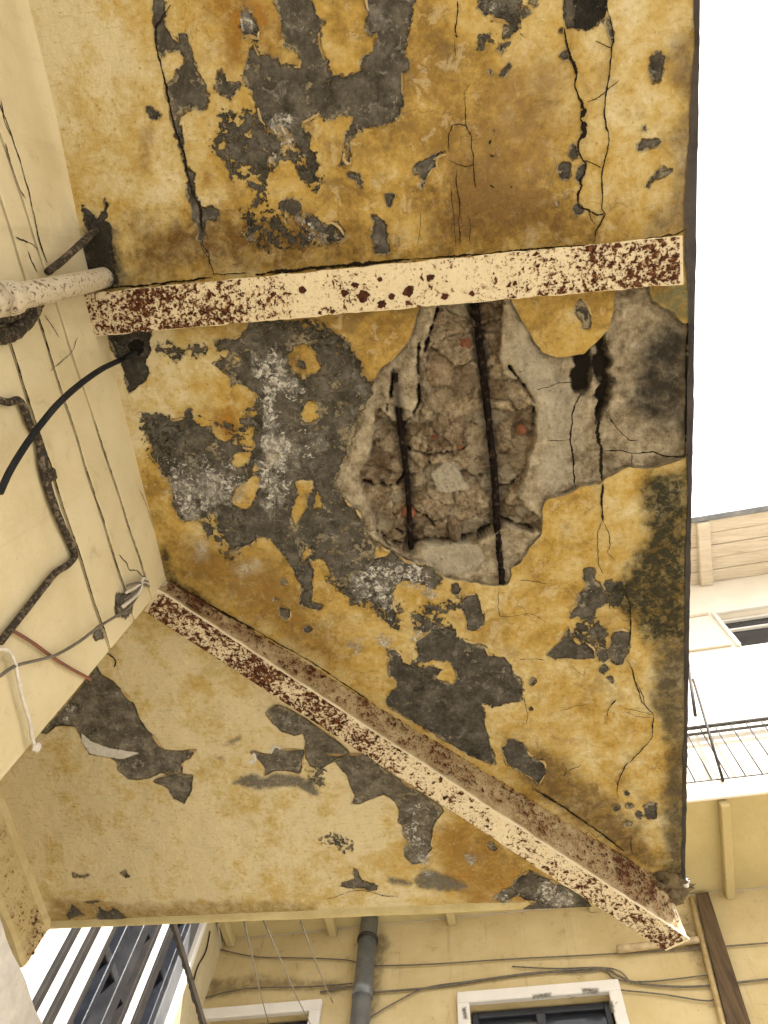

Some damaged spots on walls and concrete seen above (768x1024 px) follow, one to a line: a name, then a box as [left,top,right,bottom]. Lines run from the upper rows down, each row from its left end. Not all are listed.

crack [0,102,47,271]
peeling [145,0,416,257]
crack [108,0,619,289]
rust [84,237,680,335]
peeling [93,625,105,641]
peeling [40,666,197,804]
peeling [233,704,466,892]
spalling [107,287,688,785]
rust [146,583,683,950]
crack [498,580,545,622]
crack [565,592,654,798]
crack [537,382,694,573]